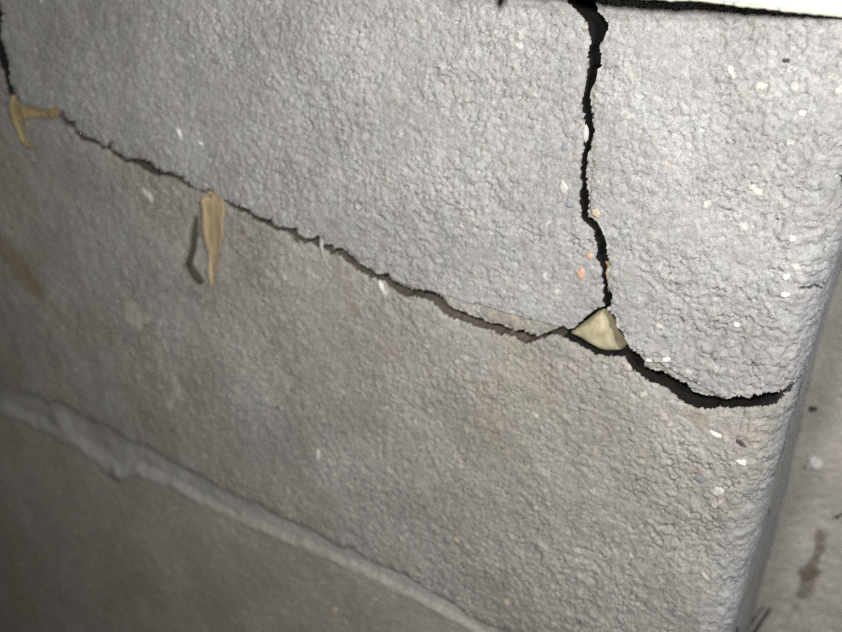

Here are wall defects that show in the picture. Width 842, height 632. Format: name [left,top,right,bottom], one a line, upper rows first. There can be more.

crack [0,6,18,100]
crack [56,0,806,409]